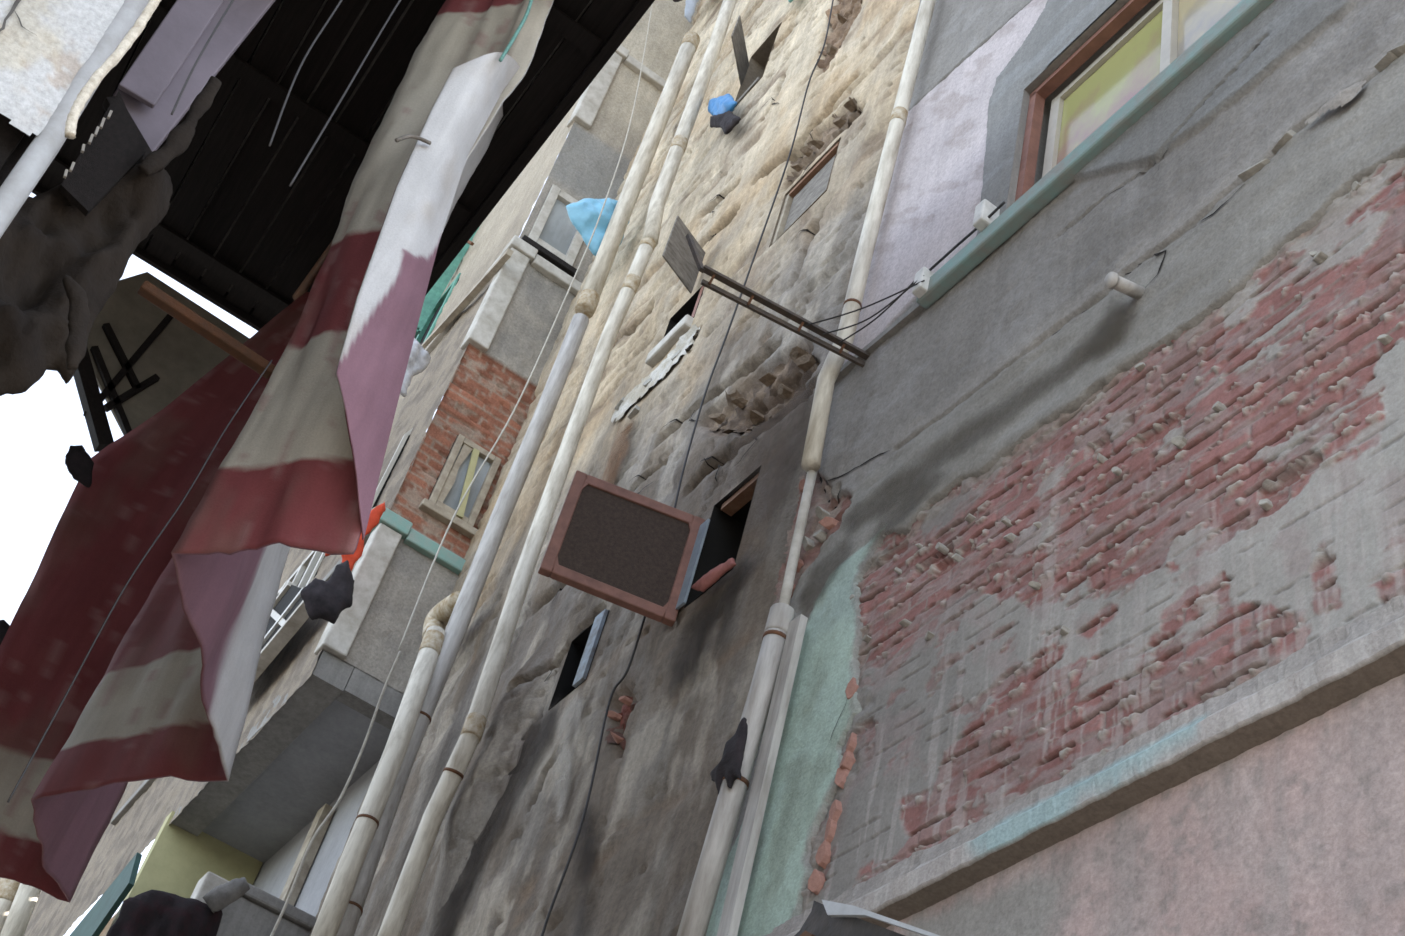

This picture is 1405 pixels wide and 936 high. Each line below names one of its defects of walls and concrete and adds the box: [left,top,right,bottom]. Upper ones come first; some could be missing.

flaking render [817,0,862,72]
flaking render [1237,44,1405,182]
flaking render [708,346,819,437]
flaking render [773,472,851,603]
crack [820,451,887,508]
flaking render [801,157,1405,914]